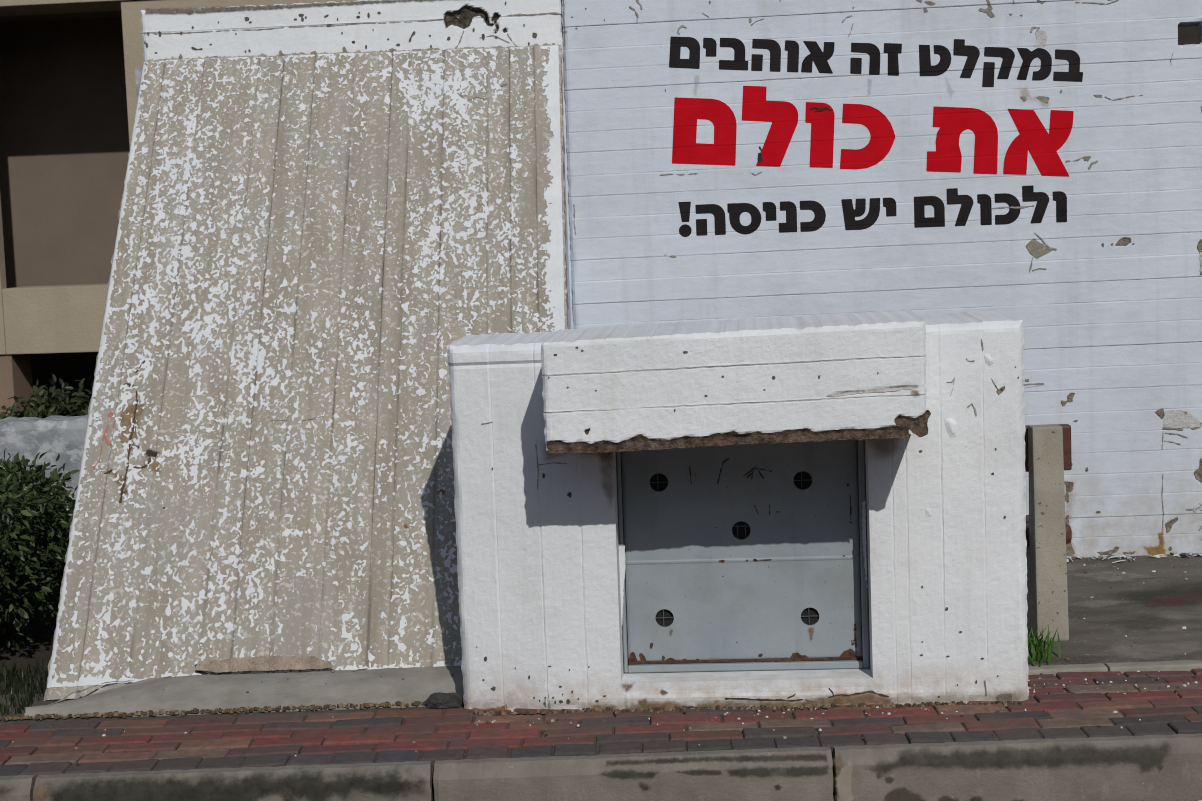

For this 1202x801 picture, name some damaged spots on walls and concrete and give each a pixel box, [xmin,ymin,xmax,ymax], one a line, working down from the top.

peeling [1026,233,1057,272]
peeling [47,1,565,698]
spalling [828,372,919,397]
spalling [546,410,931,454]
spalling [1194,458,1202,483]
peeling [1064,481,1074,525]
peeling [1066,501,1202,563]
rust [628,643,699,665]
rust [633,690,891,710]
damp [52,774,421,801]
damp [877,745,1168,801]